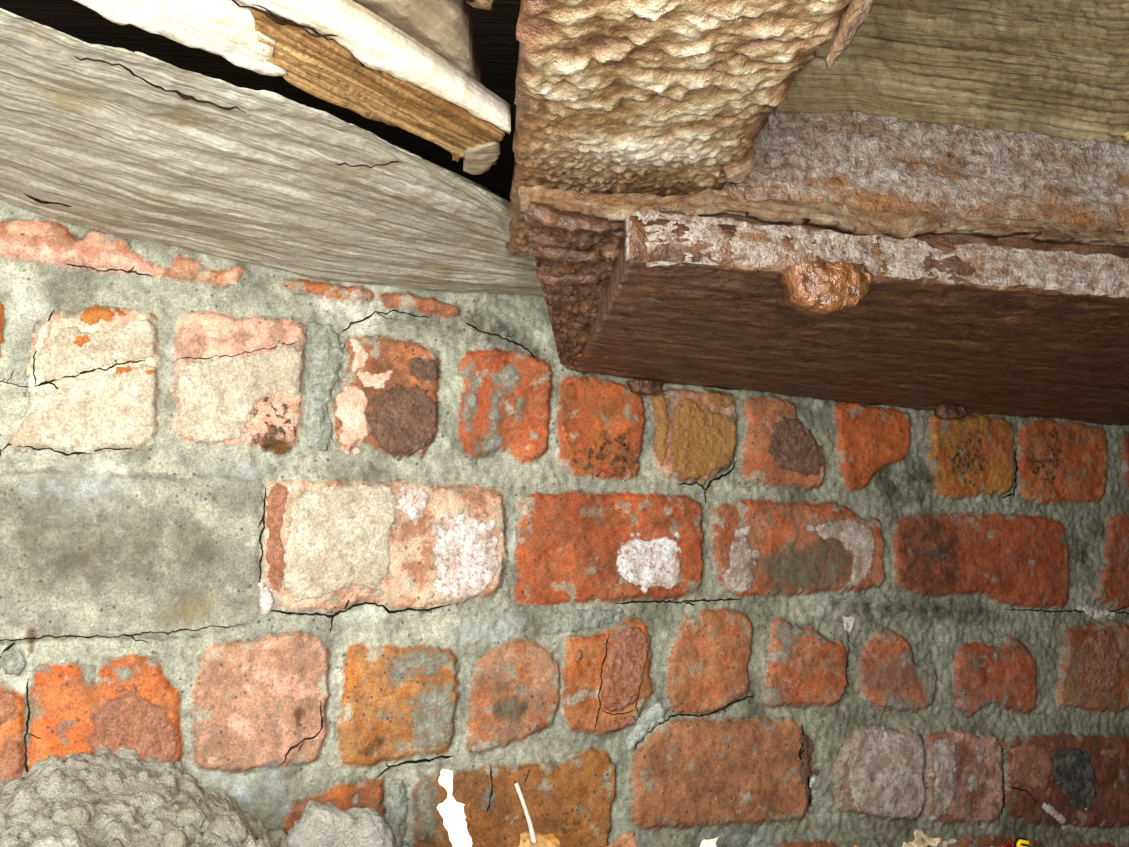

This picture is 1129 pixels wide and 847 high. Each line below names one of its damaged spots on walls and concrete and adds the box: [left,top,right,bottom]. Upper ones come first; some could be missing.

rust [720,146,756,183]
rust [531,201,611,233]
rust [536,247,600,286]
crack [0,351,144,389]
rust [626,380,664,395]
rust [934,405,967,420]
crack [258,487,266,582]
crack [271,599,451,632]
crack [0,624,244,658]
crack [593,635,754,752]
crack [24,681,41,773]
crack [278,702,323,767]